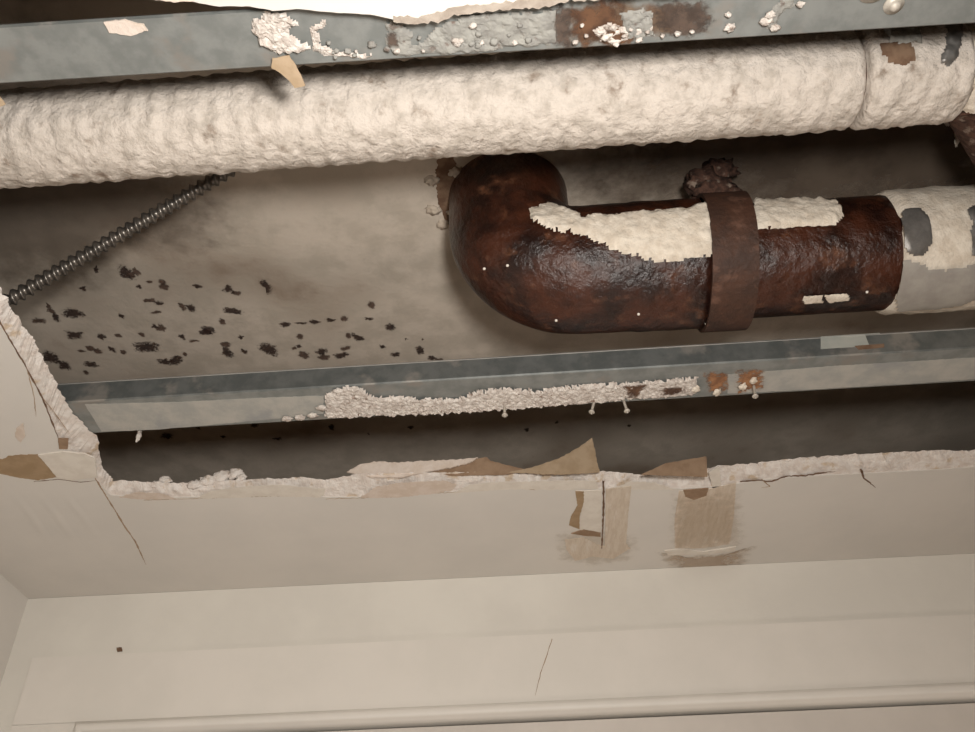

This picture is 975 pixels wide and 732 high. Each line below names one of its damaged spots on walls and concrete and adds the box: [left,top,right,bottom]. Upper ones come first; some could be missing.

corrosion [550,0,711,48]
peeling [759,0,806,32]
spalling [424,157,462,230]
crack [0,321,70,437]
leakage [43,351,70,370]
leakage [67,266,187,374]
leakage [178,307,241,342]
leakage [280,316,364,360]
corrosion [623,385,646,398]
corrosion [661,370,763,397]
peeling [0,423,97,481]
crack [34,478,146,564]